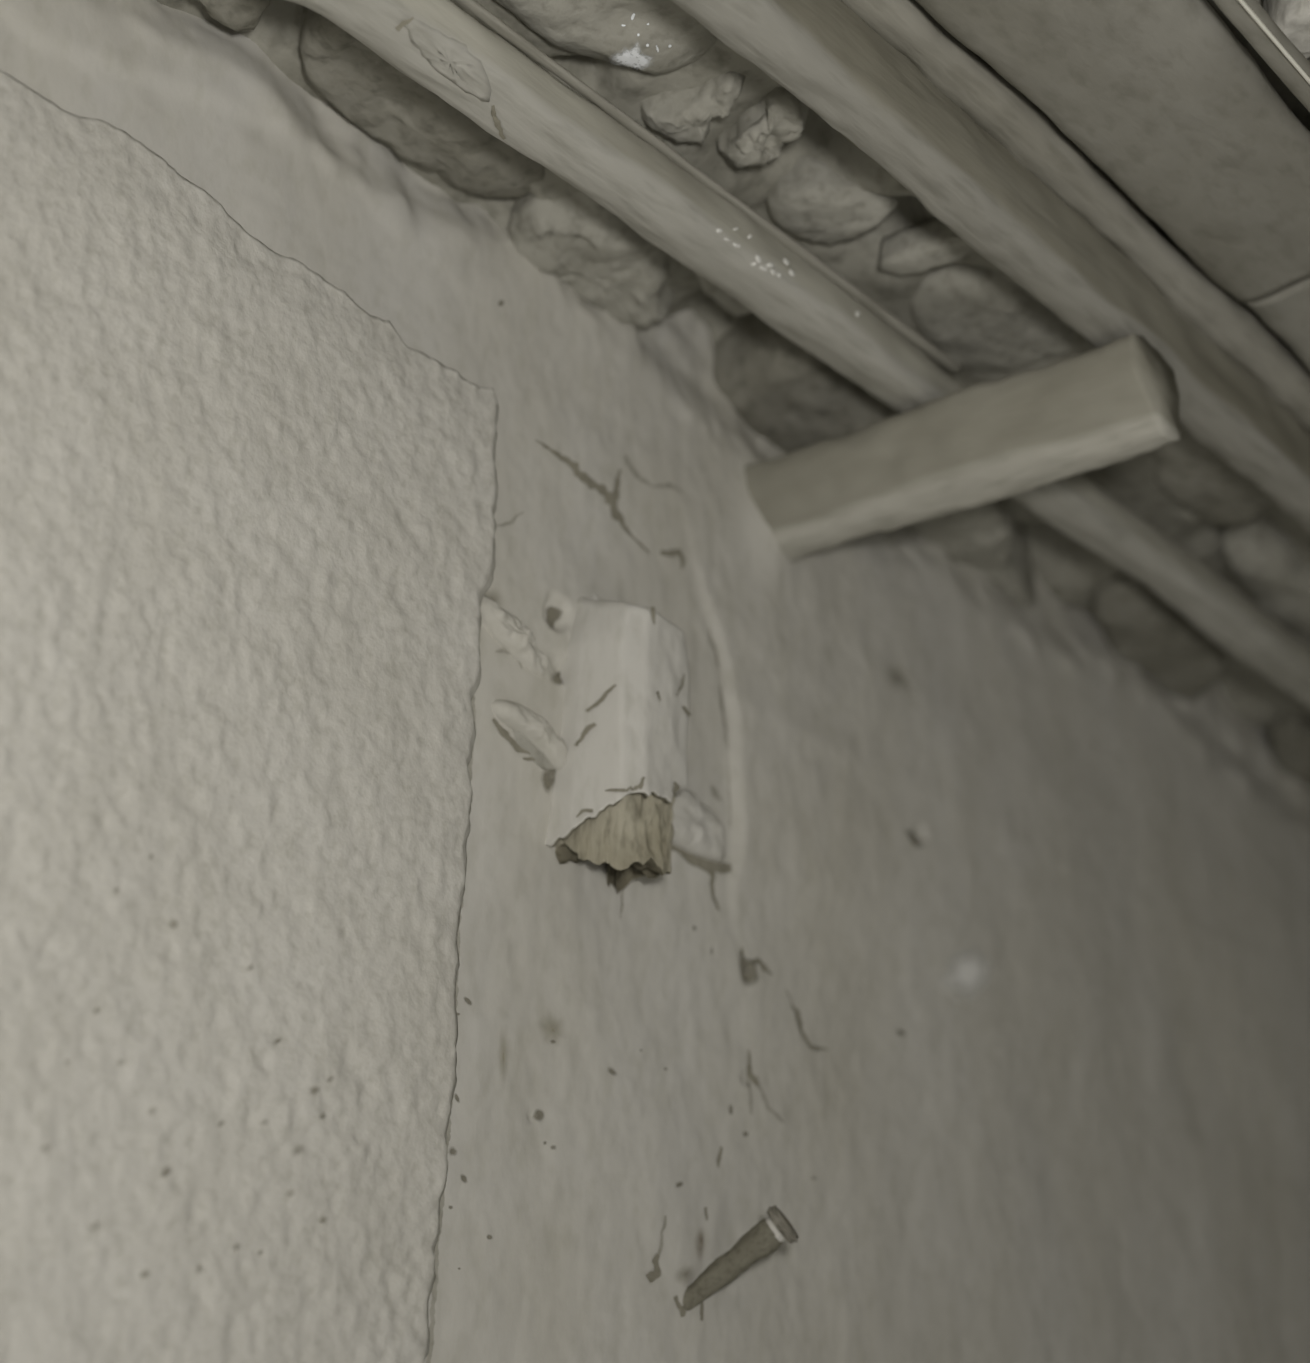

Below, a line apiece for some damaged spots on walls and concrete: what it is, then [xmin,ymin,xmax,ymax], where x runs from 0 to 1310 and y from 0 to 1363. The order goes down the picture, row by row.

crack [536,440,685,568]
spalling [547,607,562,628]
crack [786,990,828,1051]
crack [747,1049,784,1123]